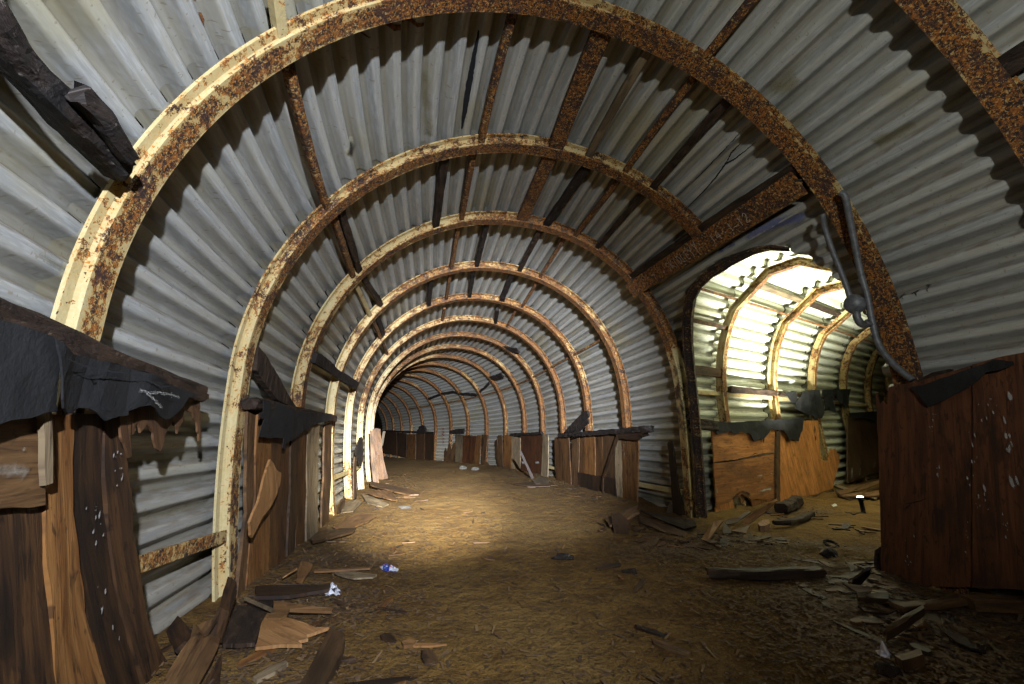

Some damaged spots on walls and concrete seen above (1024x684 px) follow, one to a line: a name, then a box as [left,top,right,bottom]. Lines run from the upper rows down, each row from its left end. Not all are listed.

rust [385,18,424,31]